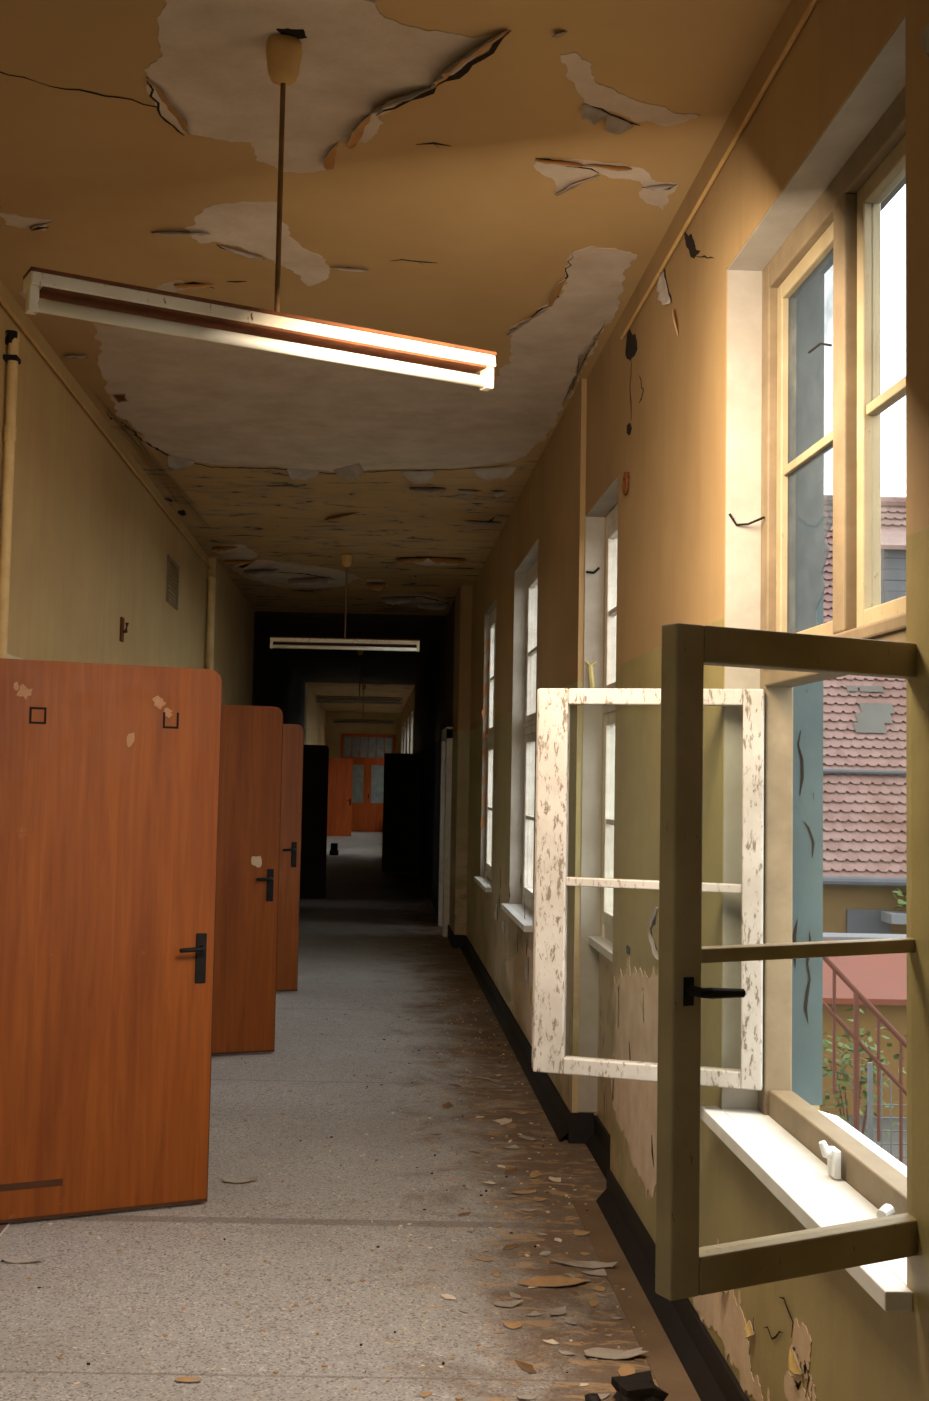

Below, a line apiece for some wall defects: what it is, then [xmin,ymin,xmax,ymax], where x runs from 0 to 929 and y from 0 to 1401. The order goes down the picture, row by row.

crack [0,71,157,108]
peeling [144,0,511,173]
peeling [552,31,699,135]
peeling [534,158,677,210]
peeling [152,201,369,287]
peeling [93,246,637,497]
spalling [625,329,644,403]
peeling [212,535,449,610]
peeling [613,907,658,1063]
peeling [611,1078,657,1200]
spalling [693,1290,816,1401]